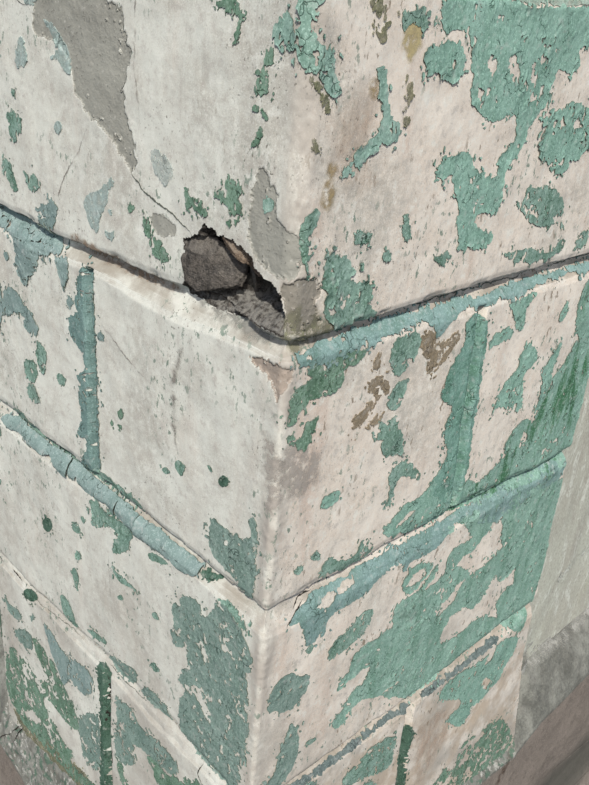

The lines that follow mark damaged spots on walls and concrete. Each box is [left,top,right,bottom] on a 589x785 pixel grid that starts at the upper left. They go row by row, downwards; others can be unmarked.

peeling [4,88,22,143]
peeling [15,36,28,68]
flaking render [24,0,138,172]
crack [131,173,189,231]
peeling [0,154,145,512]
peeling [127,0,589,785]
peeling [42,514,54,537]
peeling [70,497,141,600]
peeling [0,584,255,785]